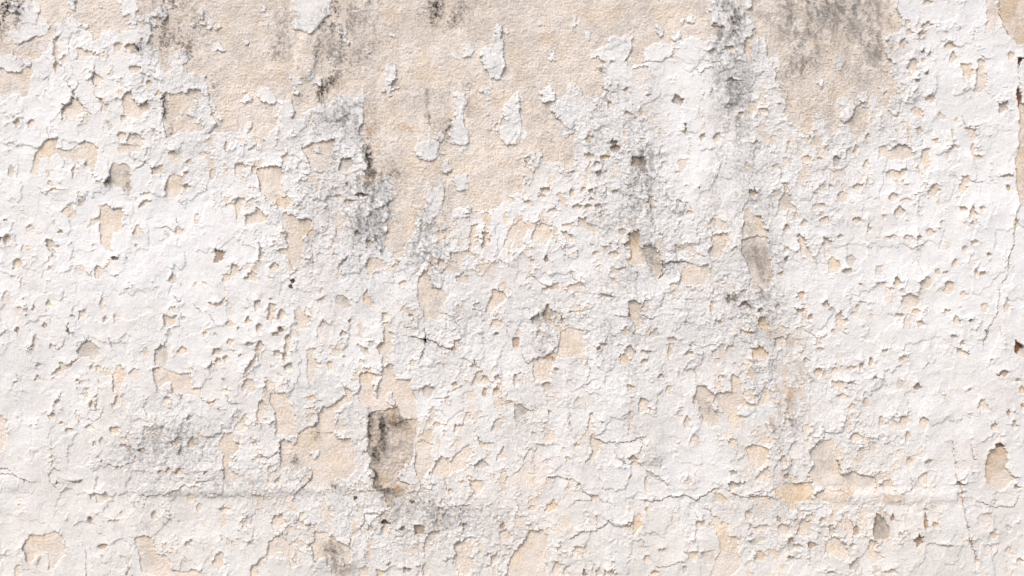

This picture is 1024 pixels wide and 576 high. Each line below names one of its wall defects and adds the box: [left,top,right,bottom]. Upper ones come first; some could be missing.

leakage [785,0,882,71]
peeling [59,91,92,127]
peeling [57,192,143,280]
leakage [352,143,400,233]
peeling [738,0,940,225]
peeling [989,101,1024,207]
peeling [35,306,229,417]
peeling [597,294,678,395]
peeling [859,239,992,358]
leakage [367,408,404,498]
peeling [208,271,591,576]
peeling [953,359,1024,492]